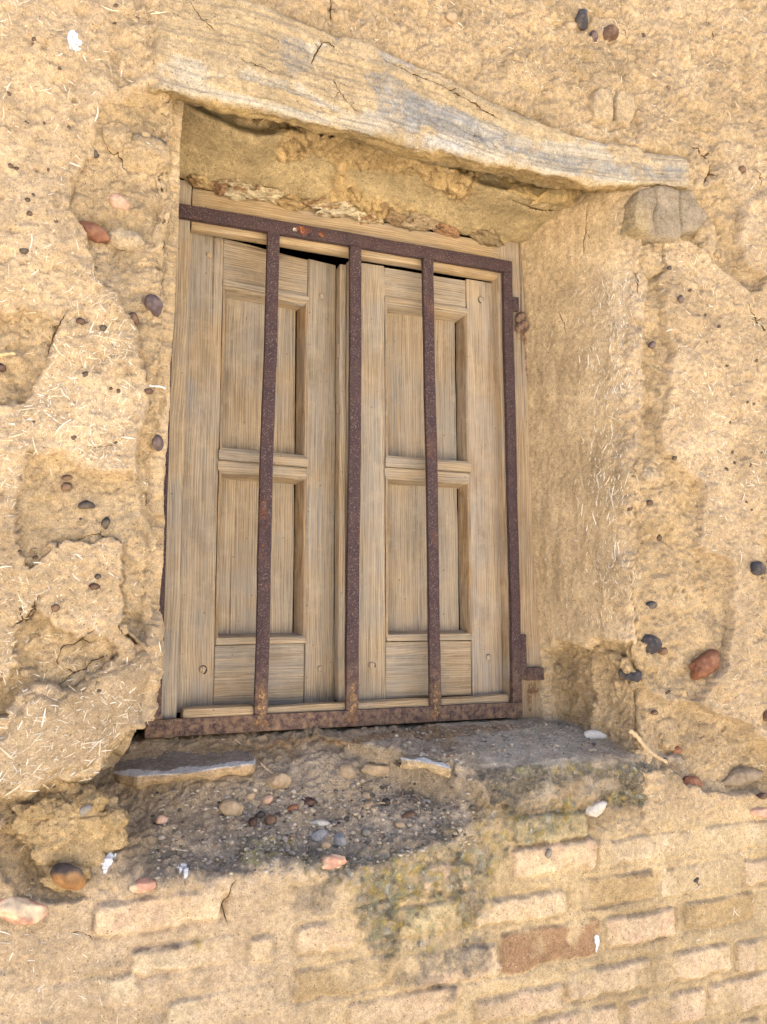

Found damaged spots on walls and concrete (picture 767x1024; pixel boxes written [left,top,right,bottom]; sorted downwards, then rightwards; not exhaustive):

spalling [0,91,178,819]
crack [56,630,109,685]
corrosion [255,689,268,725]
corrosion [271,684,512,747]
leakage [478,758,656,820]
spalling [0,832,83,900]
leakage [152,836,401,877]
leakage [416,936,490,980]